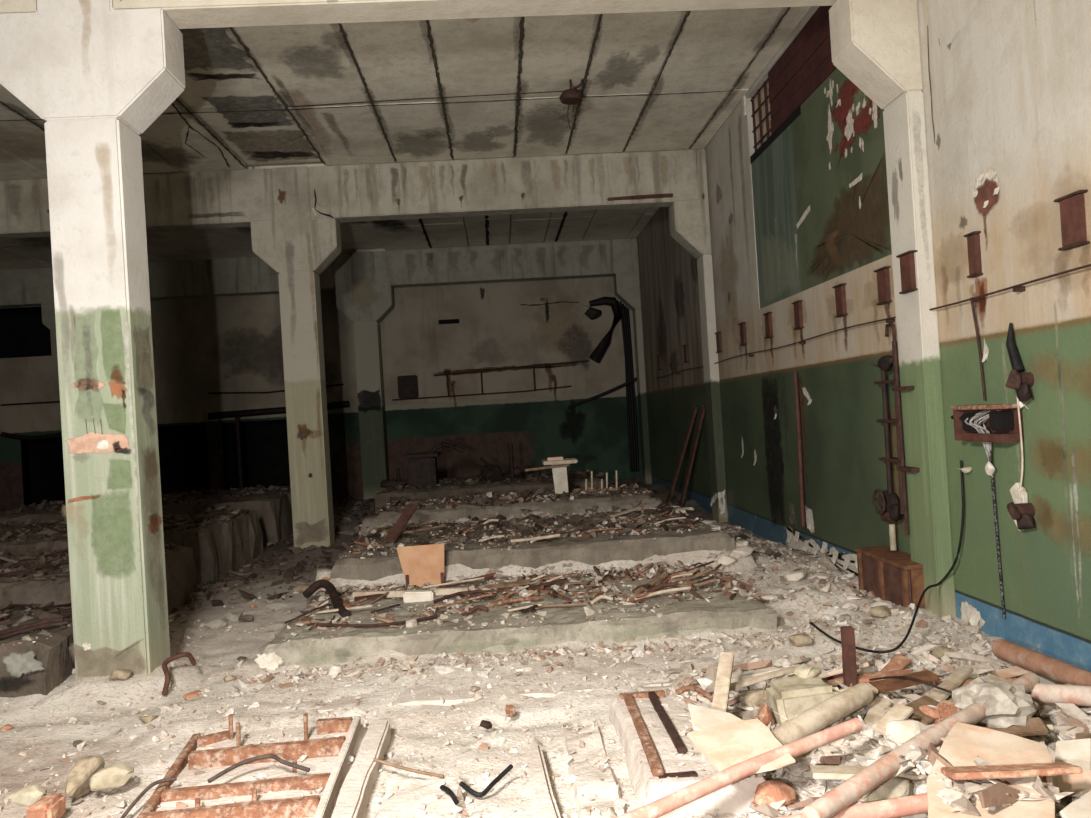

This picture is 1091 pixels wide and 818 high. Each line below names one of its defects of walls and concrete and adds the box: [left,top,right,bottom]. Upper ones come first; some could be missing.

crack [161,7,791,168]
peeling [824,79,880,170]
peeling [66,311,139,574]
rust [298,425,311,440]
damp [1070,455,1081,575]